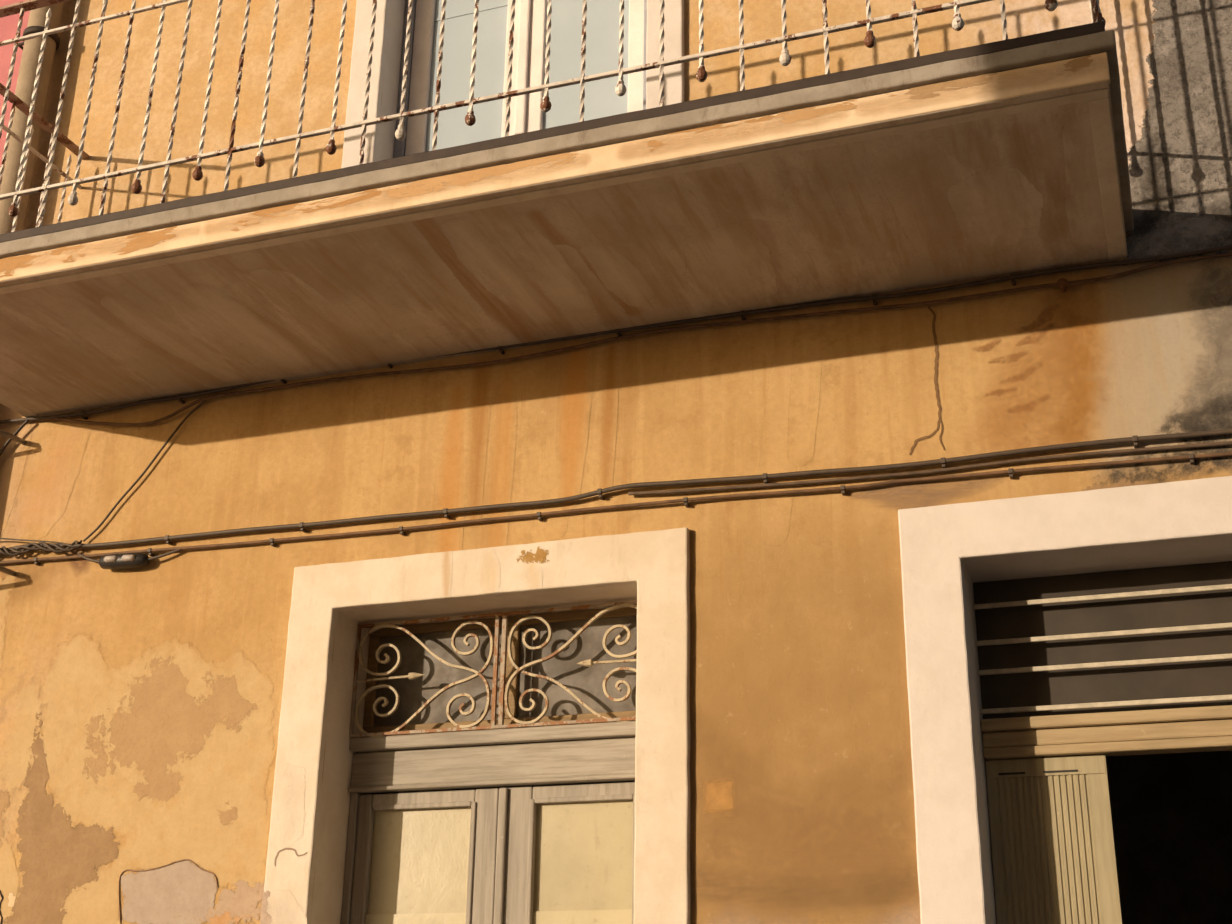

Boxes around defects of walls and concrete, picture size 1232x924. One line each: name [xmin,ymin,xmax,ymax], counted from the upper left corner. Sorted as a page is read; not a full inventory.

peeling [0,245,85,278]
peeling [115,226,177,255]
water stain [866,112,1107,261]
crack [909,306,945,455]
water stain [1079,249,1232,491]
peeling [10,419,93,540]
peeling [0,571,18,675]
peeling [0,632,277,924]
crack [0,891,16,924]